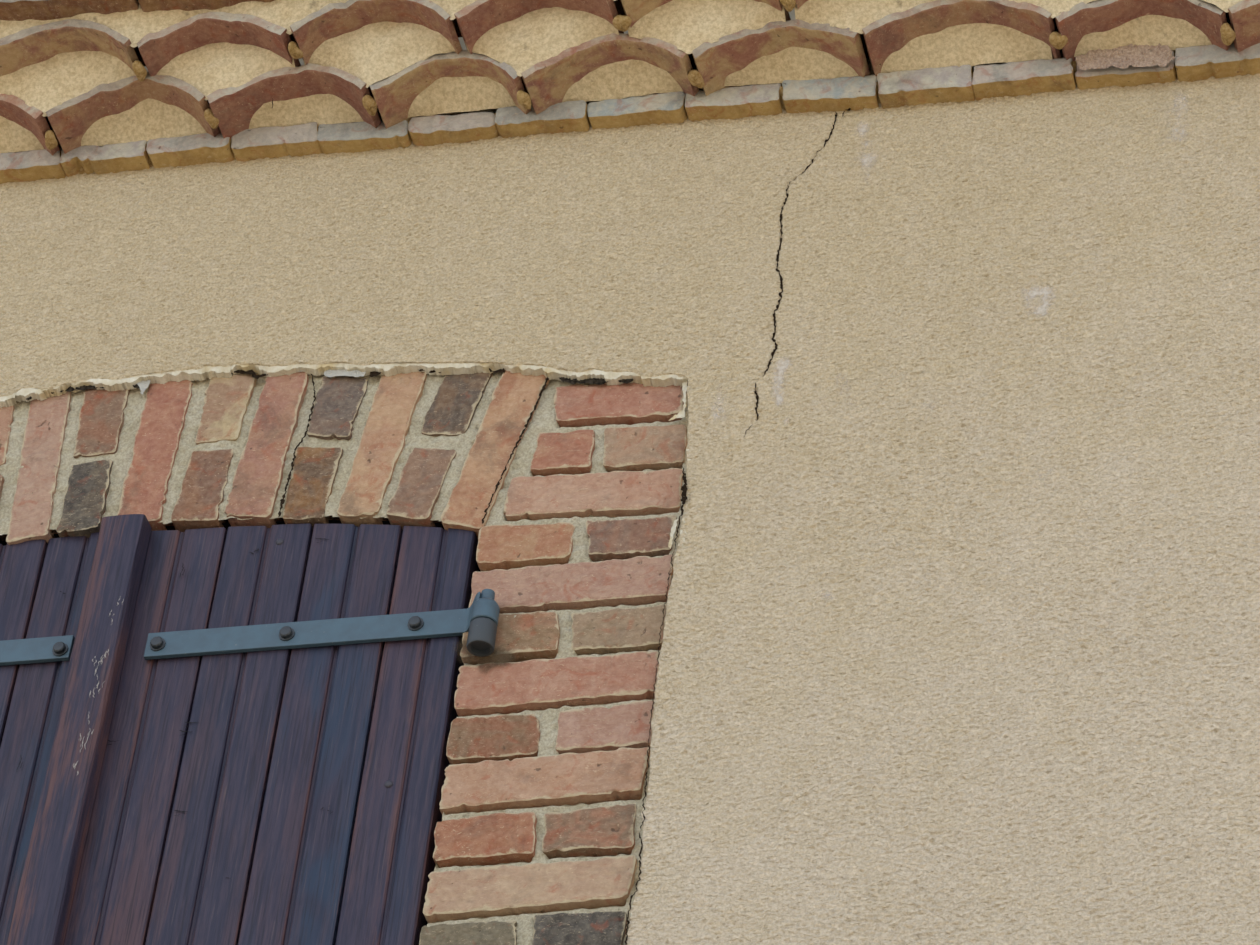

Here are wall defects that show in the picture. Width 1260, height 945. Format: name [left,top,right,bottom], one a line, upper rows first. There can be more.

crack [744,111,845,437]